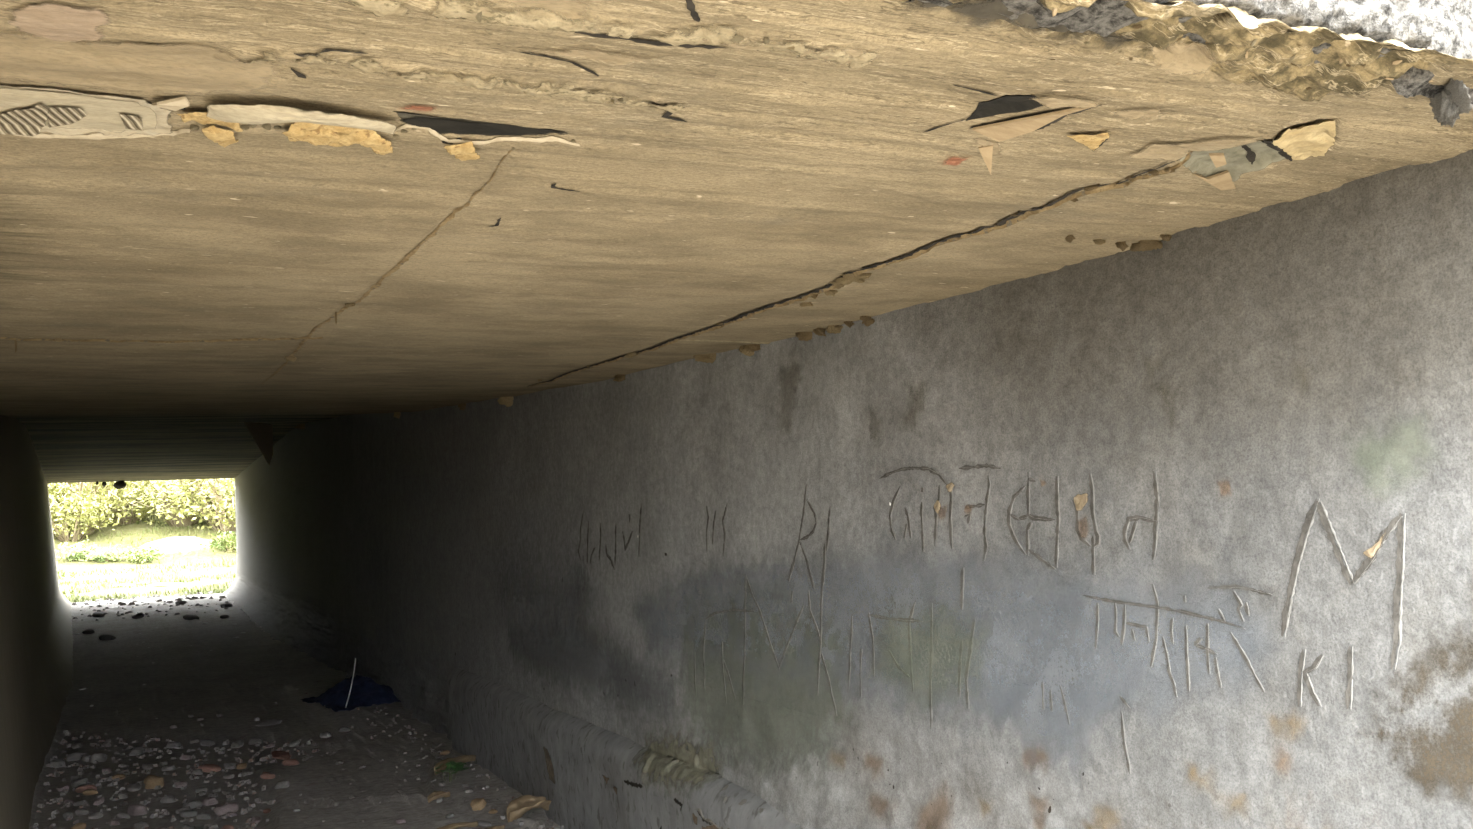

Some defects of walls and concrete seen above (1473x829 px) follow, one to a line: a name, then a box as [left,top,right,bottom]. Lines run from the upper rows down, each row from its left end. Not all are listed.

spalling [304,0,409,17]
spalling [433,0,877,69]
peeling [1152,37,1226,75]
peeling [0,4,685,161]
peeling [1113,109,1168,120]
peeling [975,138,1000,174]
peeling [1066,133,1109,151]
spalling [1130,119,1336,190]
crack [527,151,1193,387]